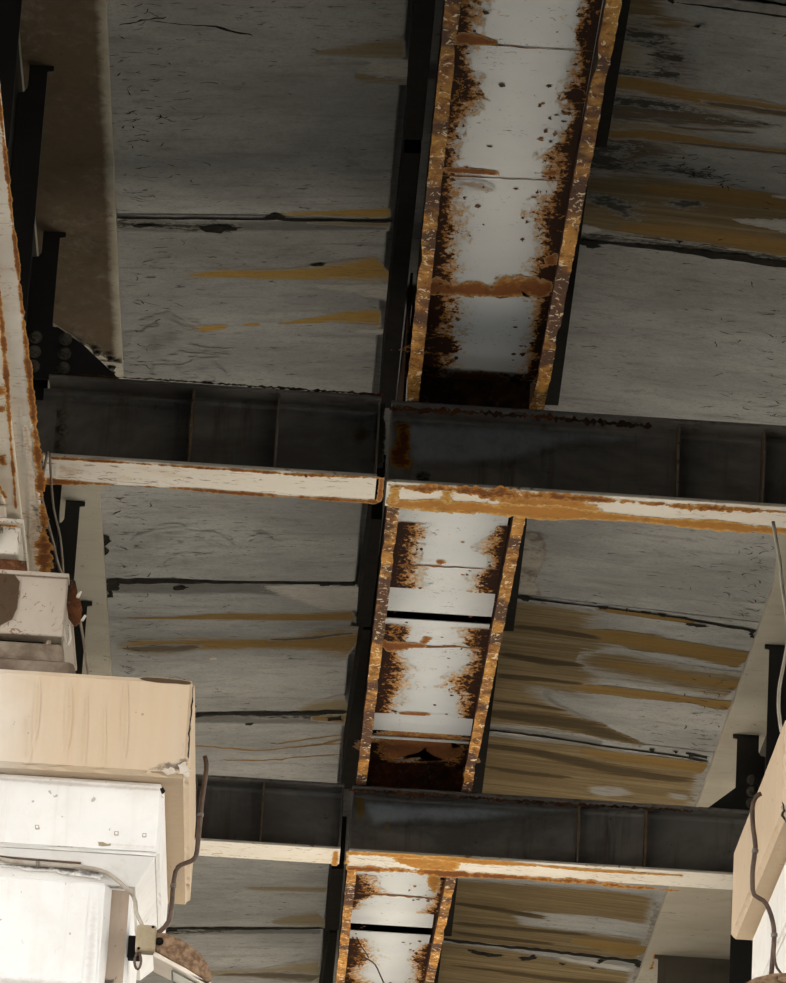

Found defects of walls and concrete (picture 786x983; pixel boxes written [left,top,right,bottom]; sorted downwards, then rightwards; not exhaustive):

rust [310,37,408,85]
rust [0,90,786,820]
rust [331,851,683,983]
water stain [552,956,634,972]